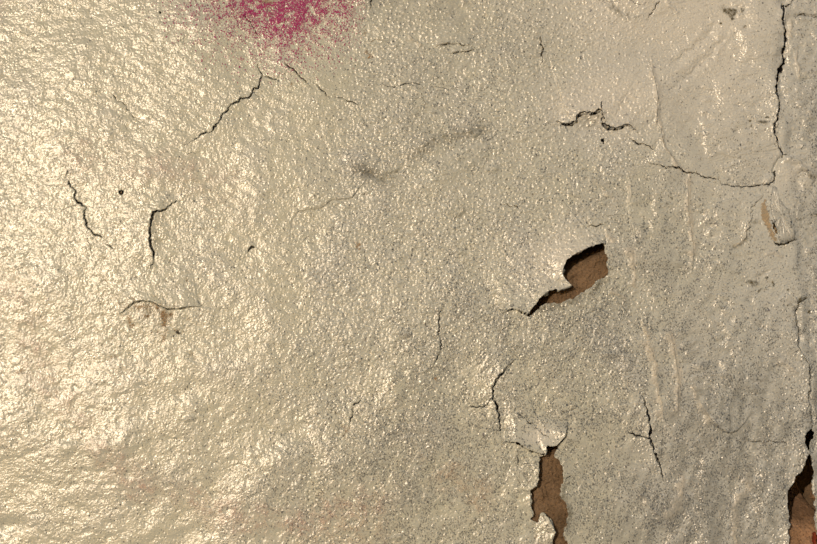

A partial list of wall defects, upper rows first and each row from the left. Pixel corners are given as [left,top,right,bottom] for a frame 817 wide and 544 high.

crack [184,61,365,154]
crack [550,3,815,187]
crack [63,165,113,263]
crack [149,191,182,268]
spalling [499,223,609,319]
crack [471,324,549,466]
spalling [506,422,568,544]
crack [628,394,663,477]
spalling [787,476,817,544]